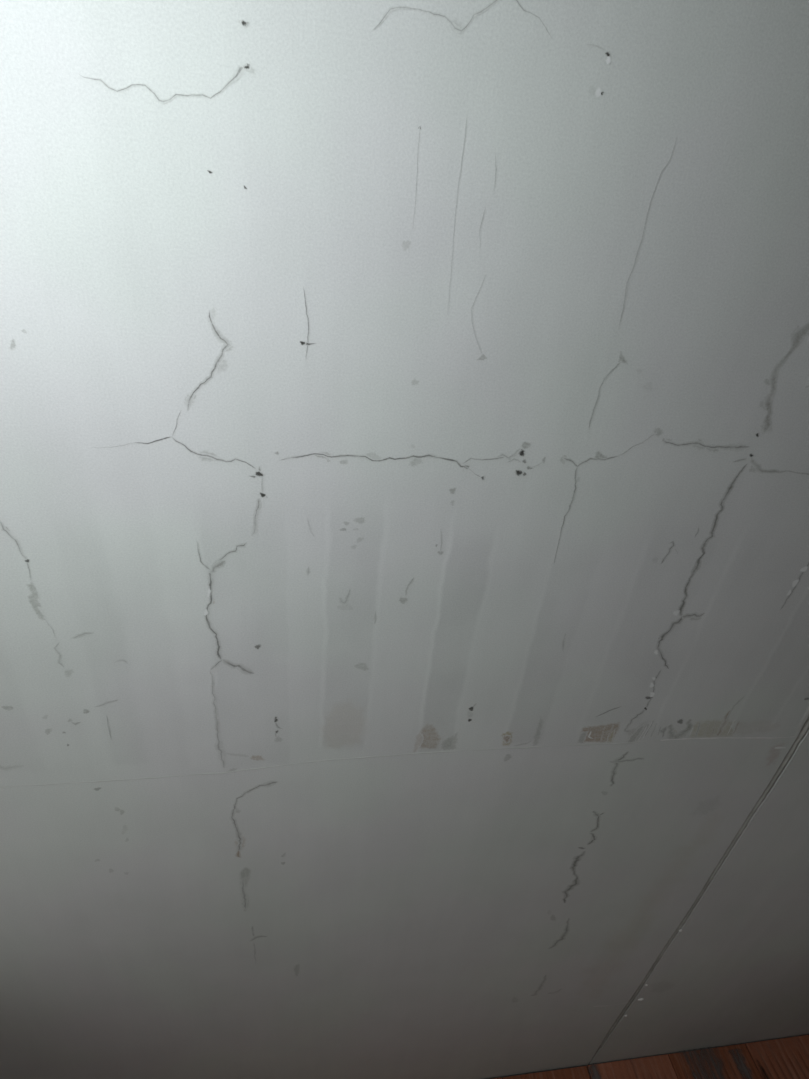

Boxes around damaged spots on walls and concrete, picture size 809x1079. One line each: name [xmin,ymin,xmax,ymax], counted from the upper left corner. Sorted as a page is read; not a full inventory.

crack [79,65,244,104]
crack [373,0,553,39]
crack [91,306,511,481]
crack [0,521,75,678]
crack [196,498,262,769]
crack [547,136,809,949]
crack [229,780,278,858]